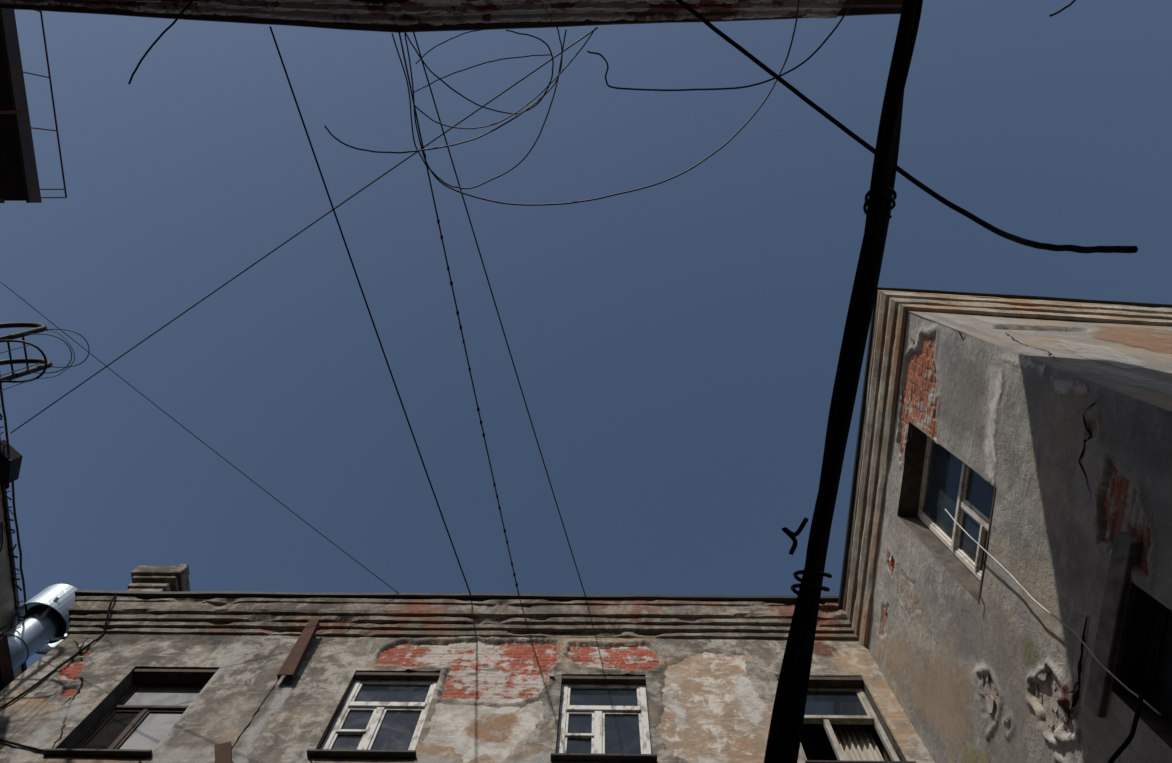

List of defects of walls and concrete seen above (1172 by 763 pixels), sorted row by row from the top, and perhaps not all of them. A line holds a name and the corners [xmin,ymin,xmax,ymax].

flaking render [900,335,938,457]
flaking render [1102,462,1151,575]
peeling [377,641,772,763]
peeling [980,674,1011,729]
spalling [1034,668,1075,735]